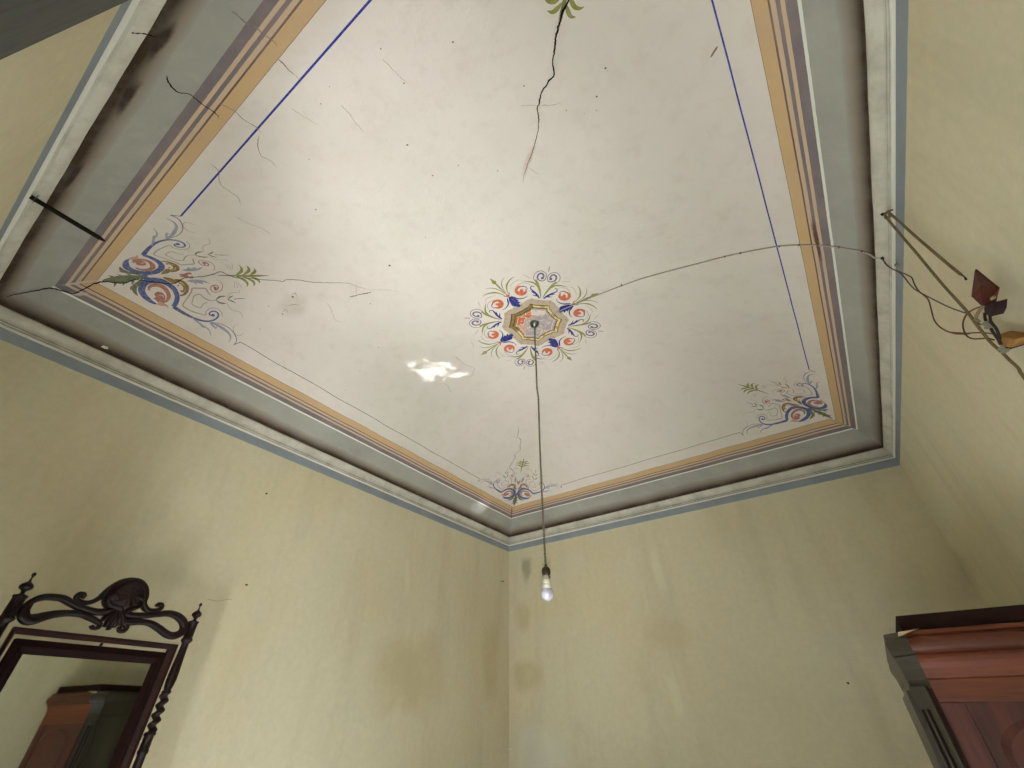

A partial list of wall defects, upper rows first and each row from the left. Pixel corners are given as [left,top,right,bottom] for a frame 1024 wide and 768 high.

crack [166,76,274,164]
crack [522,0,569,179]
crack [7,271,392,322]